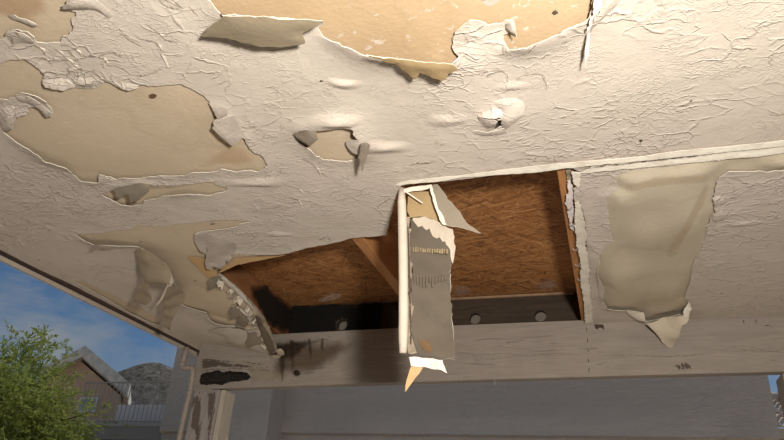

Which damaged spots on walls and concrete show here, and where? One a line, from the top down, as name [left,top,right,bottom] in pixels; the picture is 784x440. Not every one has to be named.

peeling [0,0,113,44]
crack [36,24,179,76]
peeling [202,0,621,81]
peeling [0,60,267,206]
peeling [293,128,370,171]
peeling [472,98,525,136]
peeling [75,220,285,359]
peeling [564,154,784,348]
water stain [252,285,383,376]
peeling [409,357,447,373]